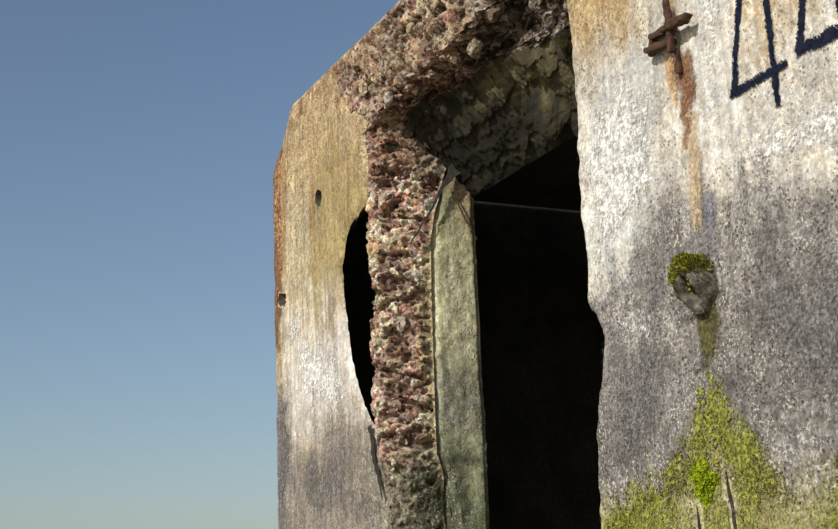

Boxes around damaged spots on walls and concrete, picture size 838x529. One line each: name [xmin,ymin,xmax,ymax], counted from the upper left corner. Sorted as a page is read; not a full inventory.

spalling [334,0,495,120]
corrosion [273,146,285,351]
crack [694,506,702,529]
crack [725,471,746,529]